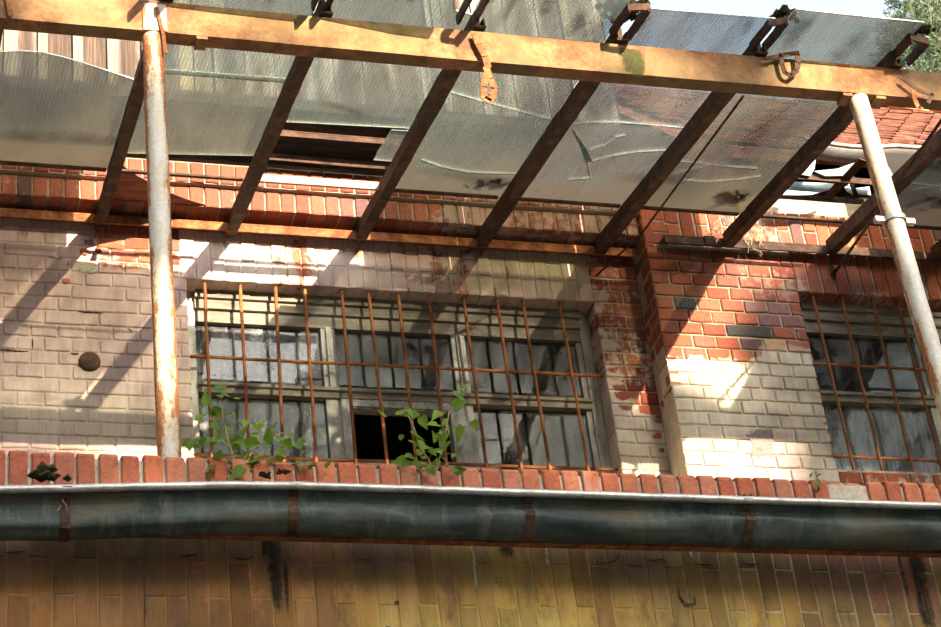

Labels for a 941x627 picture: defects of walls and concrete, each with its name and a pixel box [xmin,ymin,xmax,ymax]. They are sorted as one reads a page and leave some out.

peeling [614,392,664,453]
leakage [262,541,289,611]